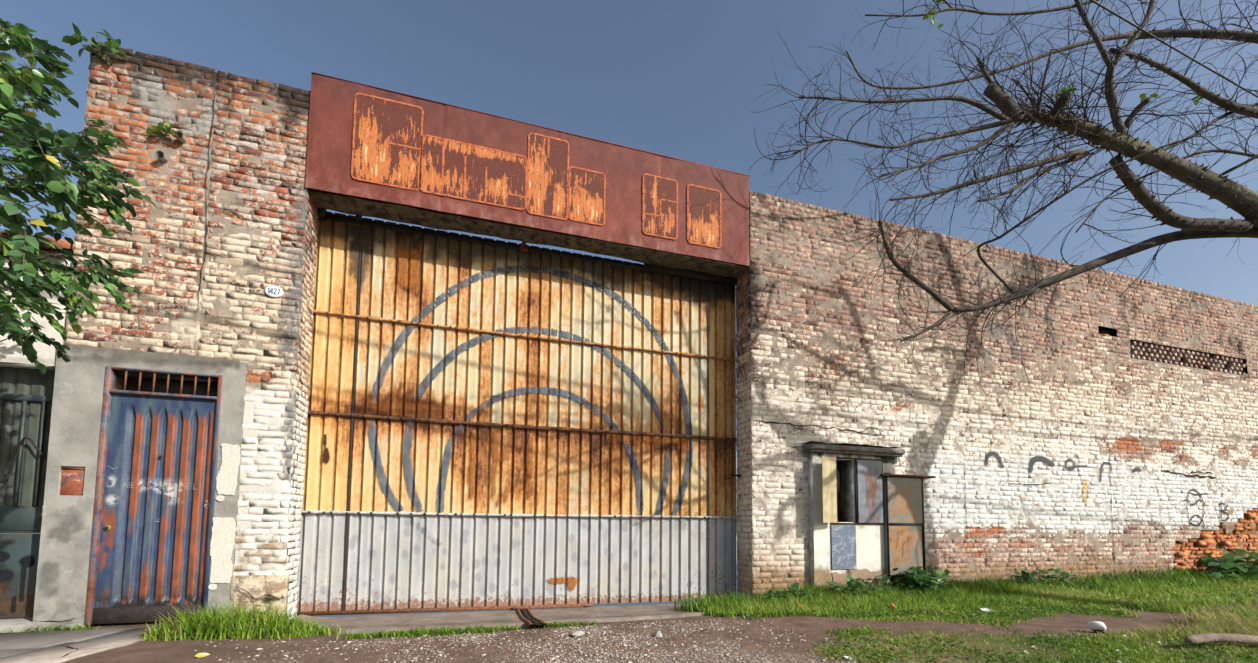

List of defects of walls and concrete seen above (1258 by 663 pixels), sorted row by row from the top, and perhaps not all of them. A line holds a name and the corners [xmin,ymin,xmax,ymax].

peeling [177,114,209,137]
crack [191,77,257,305]
rust [398,238,421,295]
rust [358,381,446,419]
rust [322,434,330,464]
rust [606,433,689,454]
rust [469,430,507,507]
spalling [1172,507,1258,574]
rust [546,577,580,591]